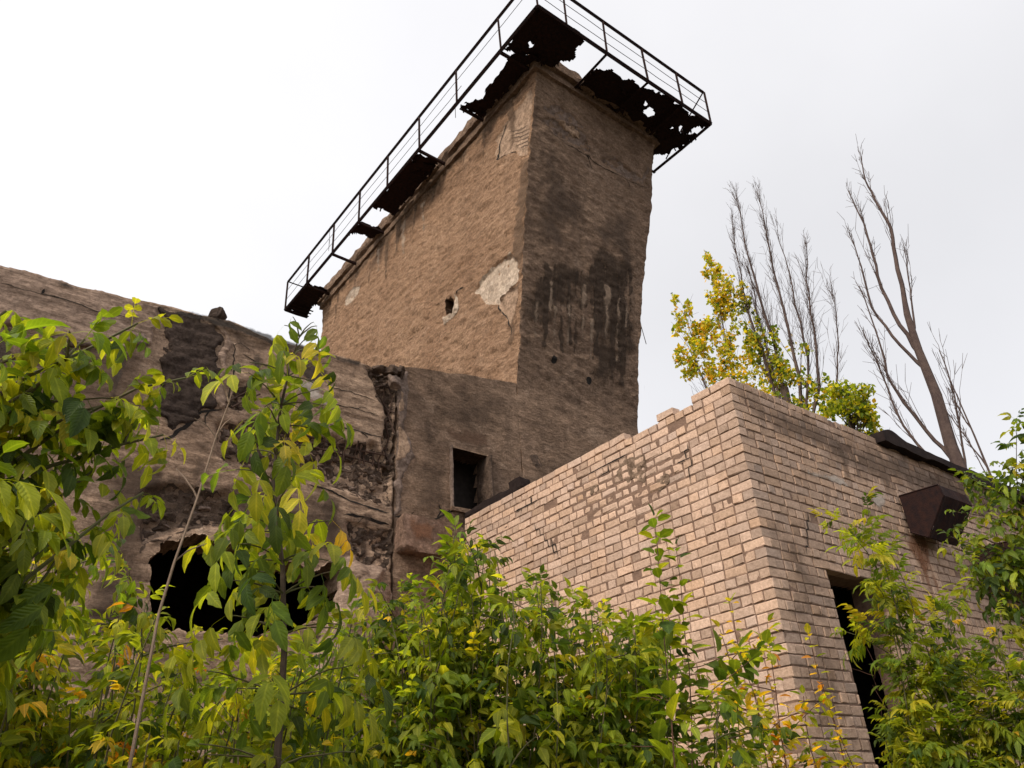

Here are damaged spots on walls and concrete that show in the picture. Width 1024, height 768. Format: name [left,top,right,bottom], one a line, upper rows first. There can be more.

spalling [442,291,459,325]
peeling [475,252,520,324]
water stain [531,221,634,386]
peeling [0,266,415,571]